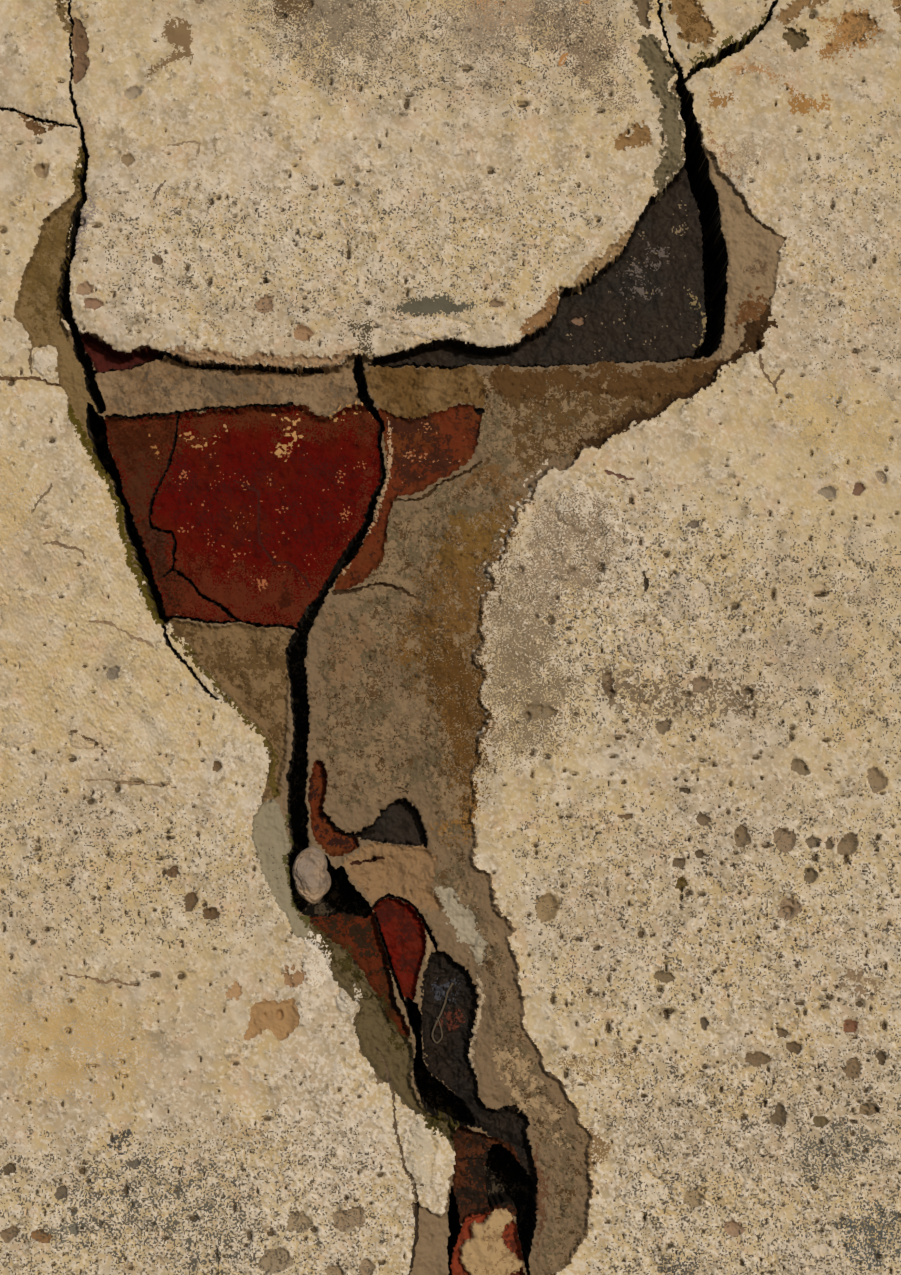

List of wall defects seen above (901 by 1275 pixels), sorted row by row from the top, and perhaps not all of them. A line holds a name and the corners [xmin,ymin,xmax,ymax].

spalling [121,153,135,167]
spalling [13,147,118,503]
crack [759,353,785,394]
crack [0,0,778,1128]
spalling [159,0,787,1275]
spalling [106,666,120,680]
spalling [778,896,802,920]
spalling [776,1028,802,1054]
spalling [55,1186,69,1198]
hole [0,1226,53,1243]